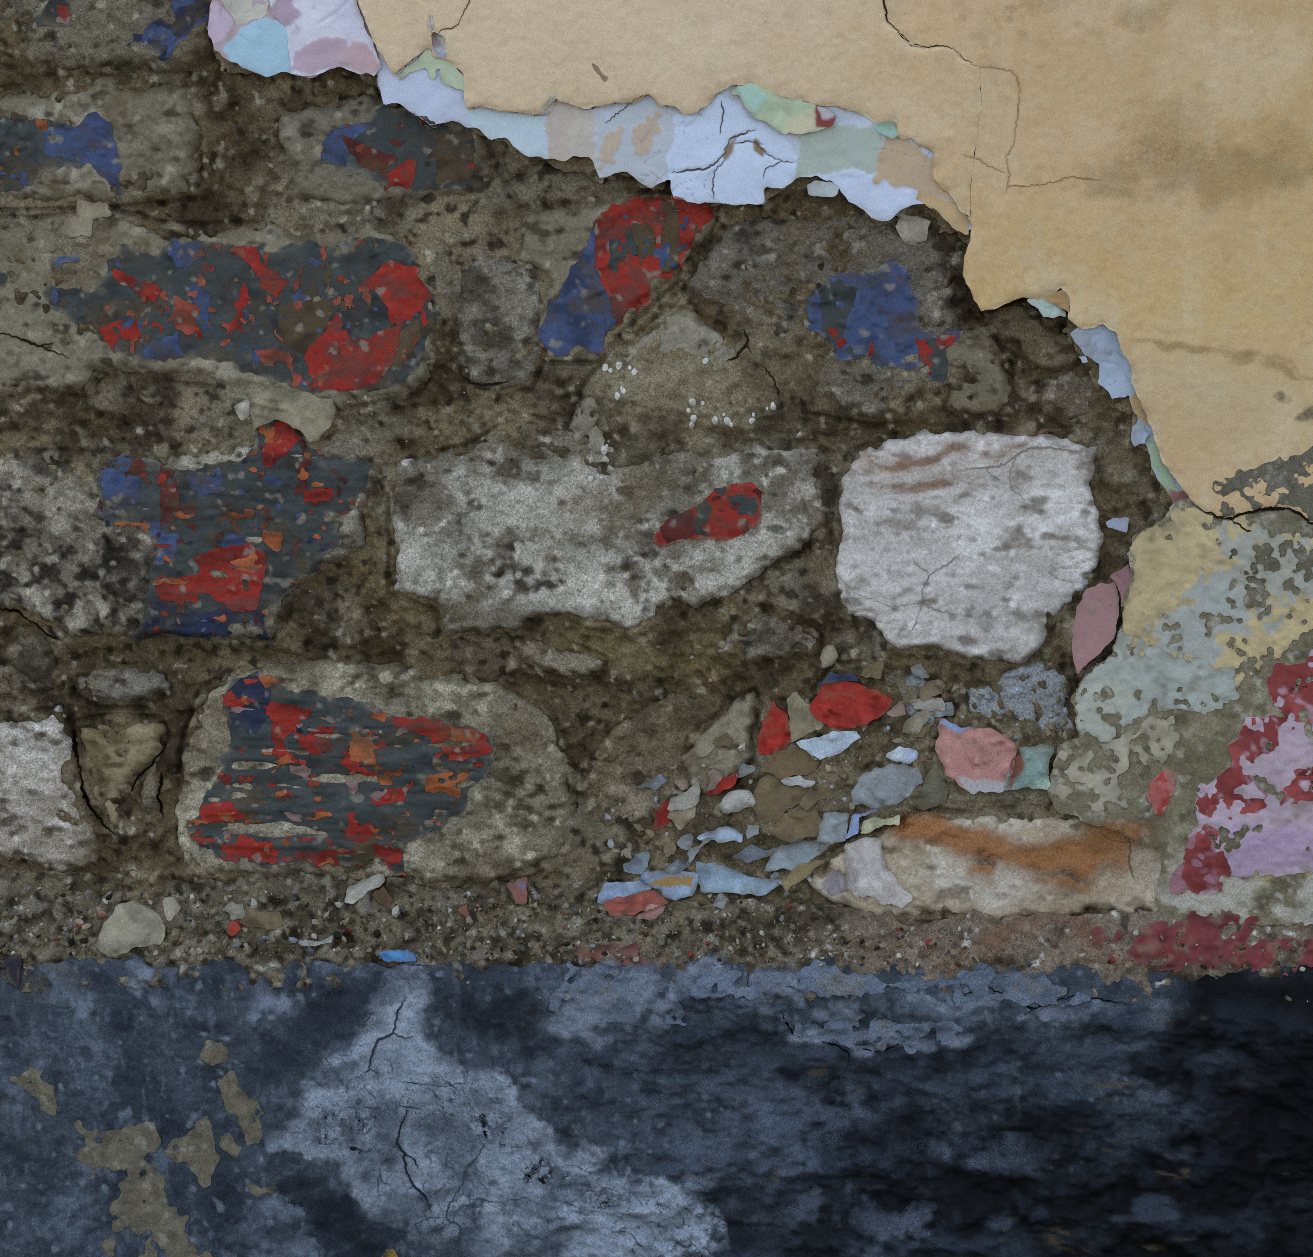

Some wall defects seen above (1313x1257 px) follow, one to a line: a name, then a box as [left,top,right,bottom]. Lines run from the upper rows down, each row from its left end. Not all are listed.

peeling [0,112,122,237]
crack [429,0,470,33]
spalling [127,0,972,358]
crack [672,101,792,198]
crack [883,0,1095,191]
peeling [806,259,964,384]
peeling [42,236,441,643]
peeling [597,290,1313,920]
peeling [188,671,496,911]
peeling [1089,909,1313,976]
spalling [74,1040,264,1257]
crack [361,1000,548,1257]